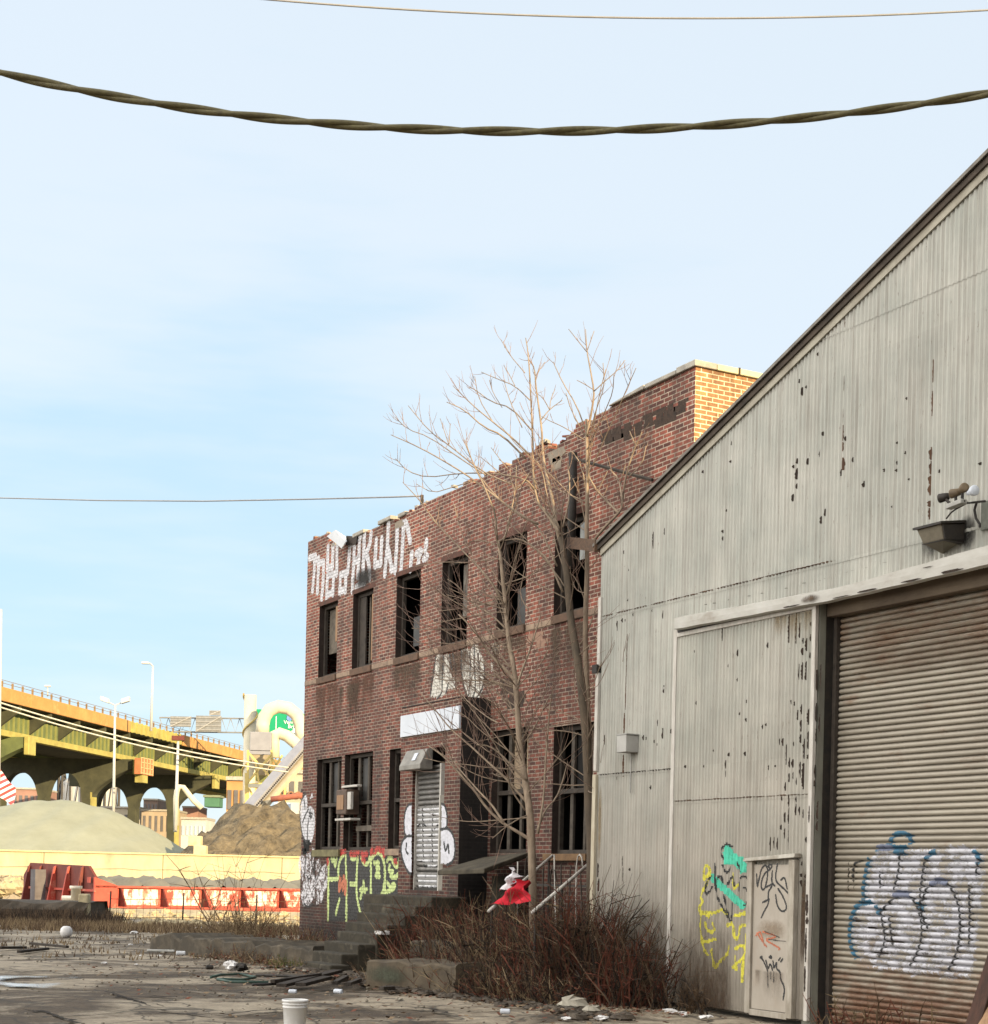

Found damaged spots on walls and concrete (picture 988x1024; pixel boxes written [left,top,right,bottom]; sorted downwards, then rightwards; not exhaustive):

peeling [783,604,821,690]
peeling [768,700,820,851]
peeling [799,862,809,992]